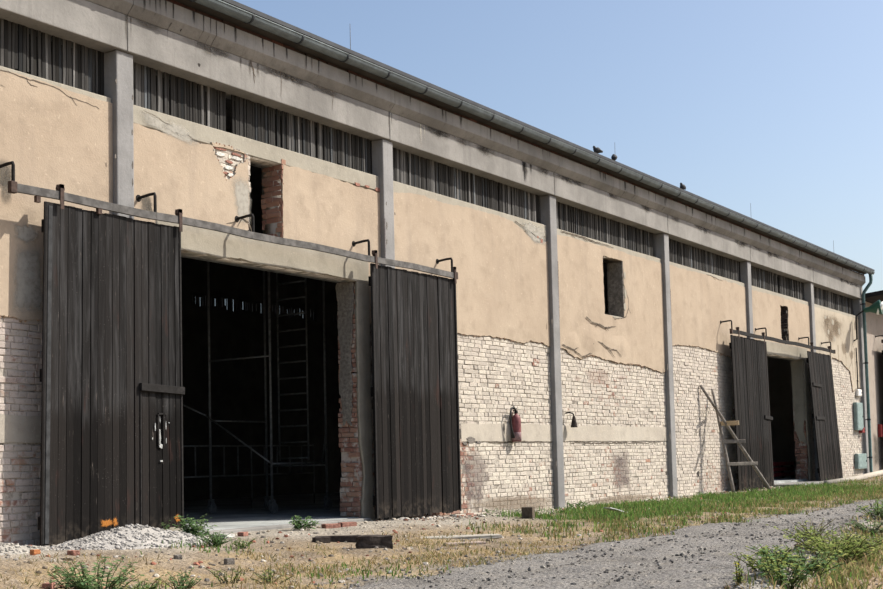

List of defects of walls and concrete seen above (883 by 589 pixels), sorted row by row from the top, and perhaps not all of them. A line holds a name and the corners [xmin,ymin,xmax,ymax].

crack [0,70,99,109]
flaking render [209,142,251,193]
flaking render [0,315,42,416]
crack [563,284,631,357]
flaking render [400,333,738,518]
flaking render [0,445,45,555]